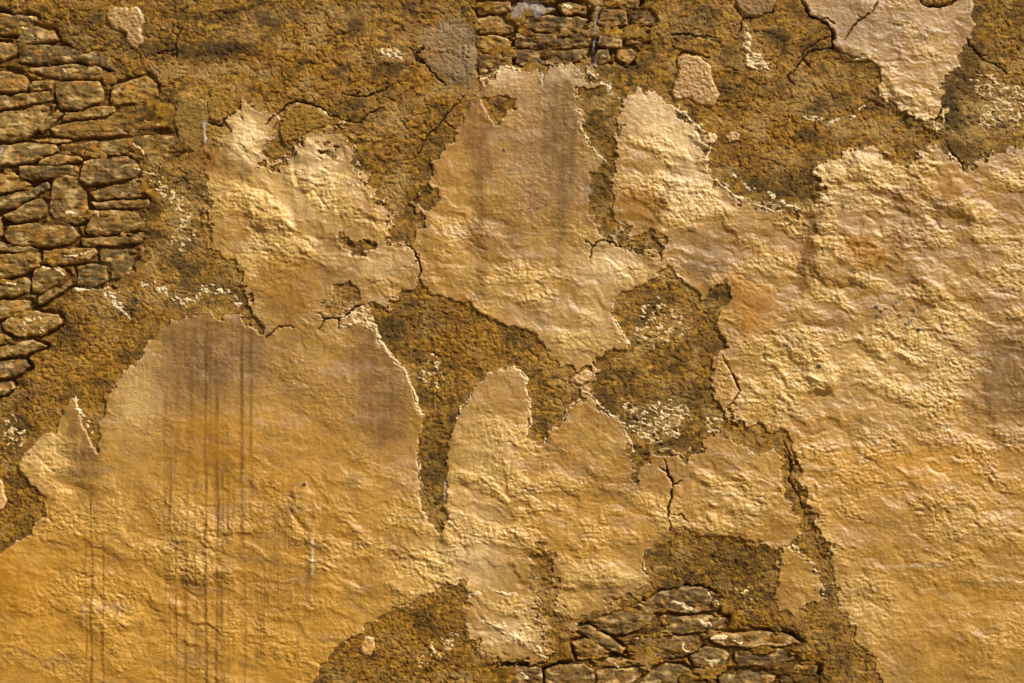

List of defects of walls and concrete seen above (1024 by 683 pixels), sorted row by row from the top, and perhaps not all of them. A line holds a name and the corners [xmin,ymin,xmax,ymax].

flaking render [0,0,1024,262]
crack [786,0,878,84]
flaking render [0,6,265,553]
flaking render [313,266,883,683]
crack [659,460,683,529]